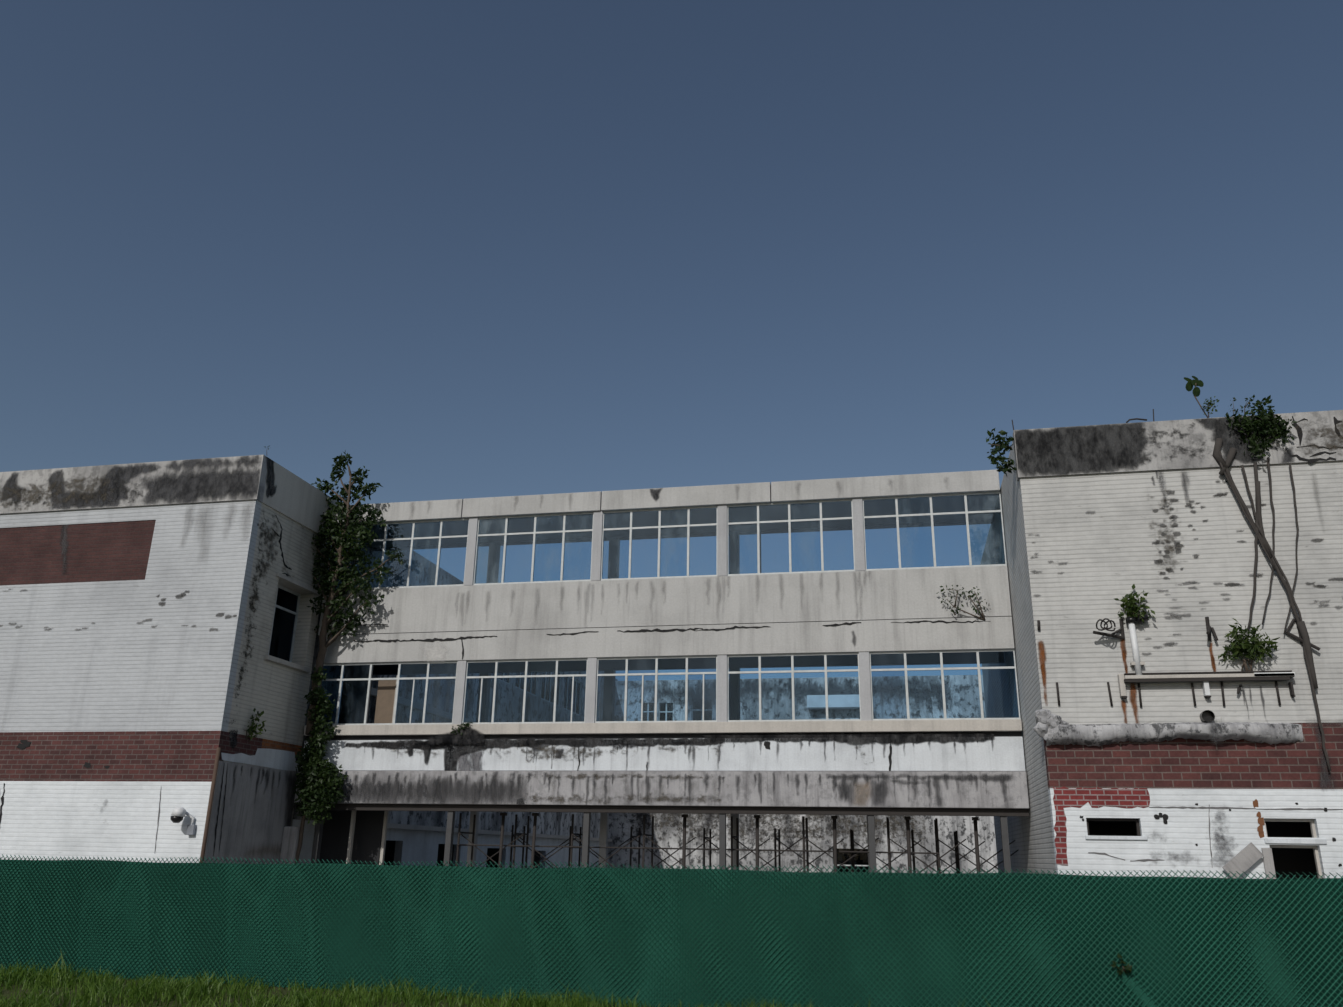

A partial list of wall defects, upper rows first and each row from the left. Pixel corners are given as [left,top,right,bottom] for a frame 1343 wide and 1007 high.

damp [0,455,277,510]
damp [1014,422,1203,514]
damp [1269,424,1343,463]
crack [1286,416,1343,464]
crack [354,636,497,659]
crack [547,626,770,635]
crack [822,619,991,627]
rust [1038,641,1046,701]
rust [1121,639,1138,723]
damp [342,674,1010,849]